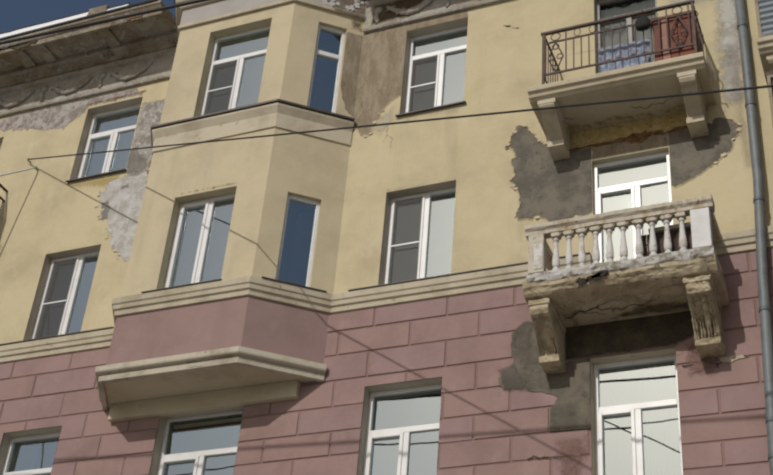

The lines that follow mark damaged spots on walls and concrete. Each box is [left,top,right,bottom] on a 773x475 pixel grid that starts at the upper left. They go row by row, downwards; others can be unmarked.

peeling [322,0,468,137]
peeling [0,88,165,262]
peeling [505,124,592,222]
peeling [611,117,742,188]
spalling [575,270,609,286]
crack [565,299,674,319]
leakage [566,311,694,360]
crack [615,265,685,279]